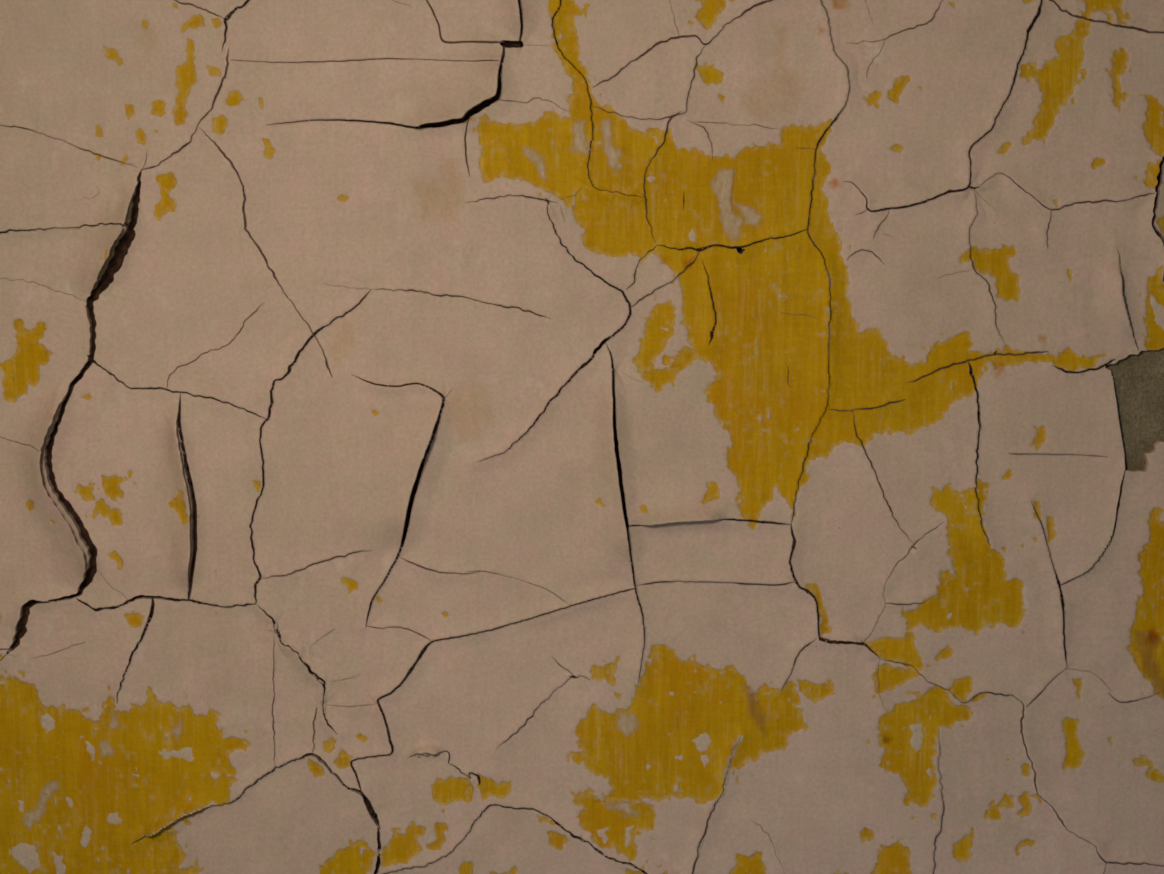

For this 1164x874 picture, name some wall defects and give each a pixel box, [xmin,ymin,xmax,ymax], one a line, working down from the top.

peeling [351,0,1164,584]
crack [843,0,1164,545]
crack [0,0,850,874]
peeling [0,654,257,874]
peeling [319,774,512,874]
peeling [537,644,835,874]
peeling [805,583,832,635]
crack [715,388,1160,874]
peeling [865,469,1027,820]
peeling [1062,717,1085,771]
peeling [1127,507,1164,700]
peeling [1133,755,1164,783]